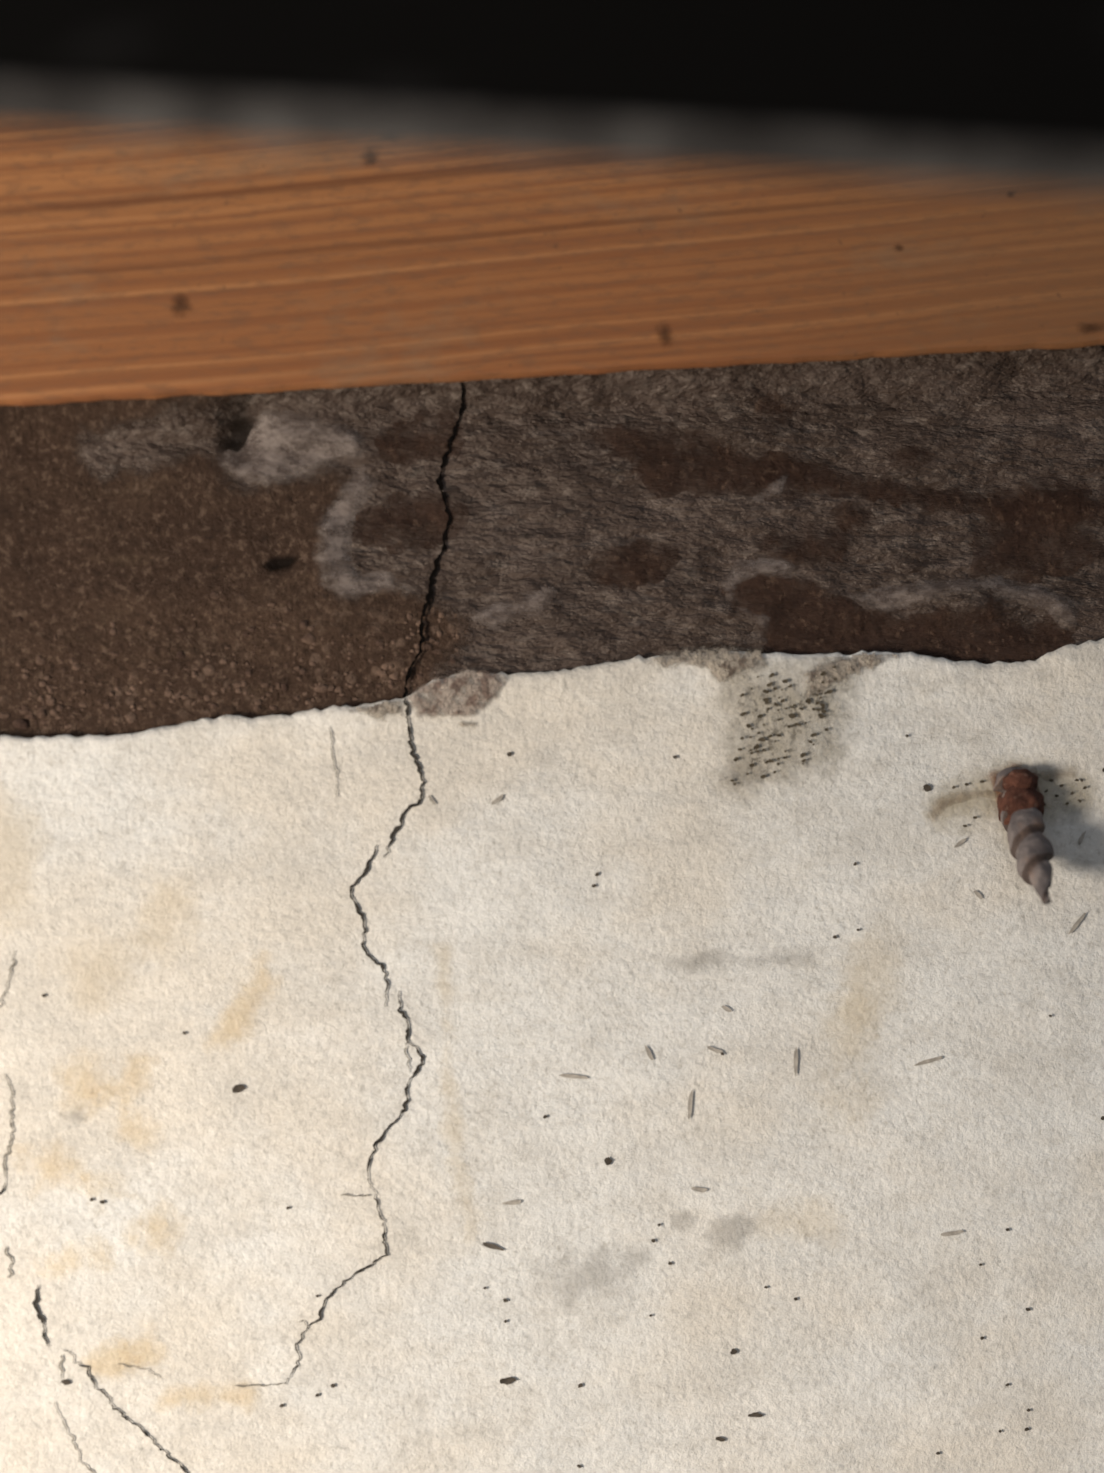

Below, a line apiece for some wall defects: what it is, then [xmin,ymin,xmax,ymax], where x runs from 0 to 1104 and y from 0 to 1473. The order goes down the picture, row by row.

peeling [0,345,1104,786]
crack [0,955,15,1006]
crack [236,382,465,1387]
crack [0,1074,14,1194]
crack [4,1247,188,1473]